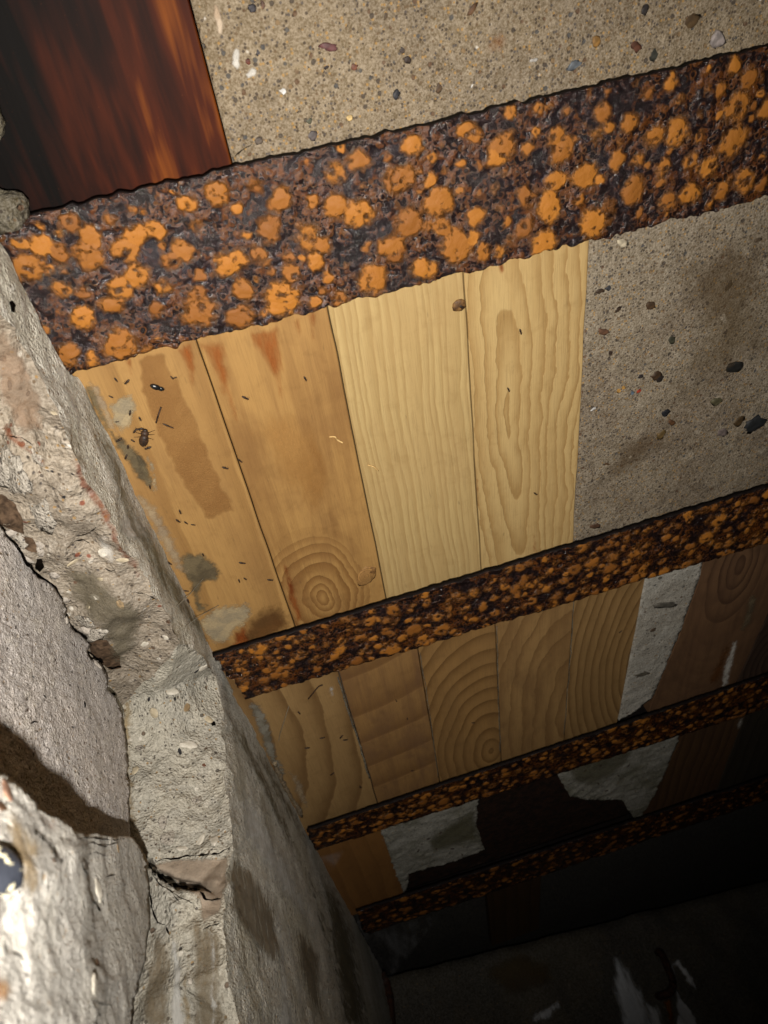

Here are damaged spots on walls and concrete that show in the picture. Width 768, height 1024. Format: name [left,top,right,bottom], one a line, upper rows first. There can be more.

damp [87,387,219,628]
crack [149,845,232,936]